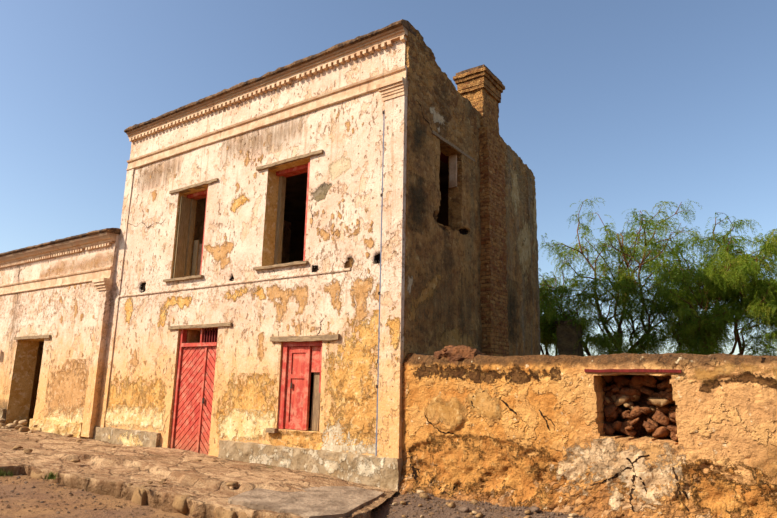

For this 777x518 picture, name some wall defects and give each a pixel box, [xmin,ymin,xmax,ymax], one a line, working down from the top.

peeling [218,143,265,215]
peeling [157,292,192,327]
peeling [203,156,400,477]
peeling [43,350,89,419]
peeling [107,339,167,416]
crack [471,391,517,415]
spalling [405,432,777,518]
crack [590,455,650,512]